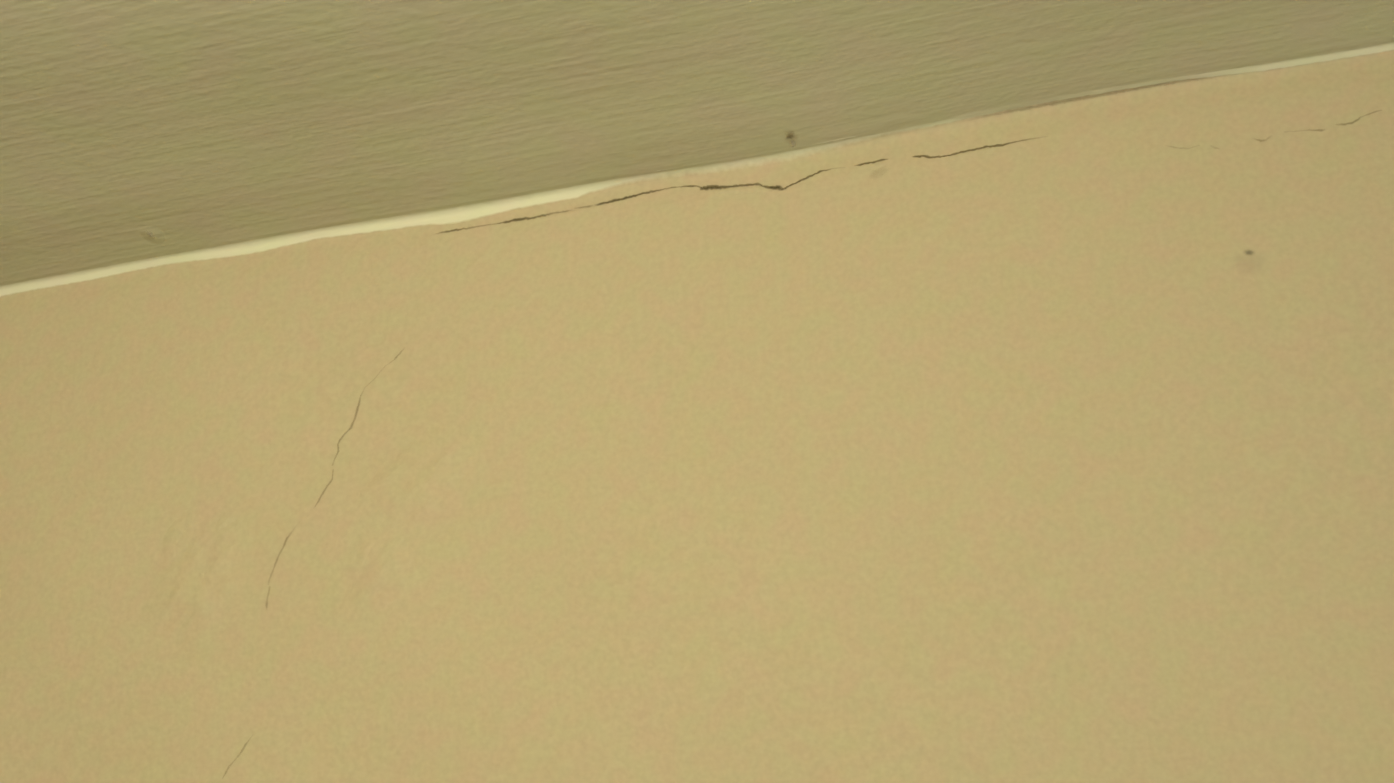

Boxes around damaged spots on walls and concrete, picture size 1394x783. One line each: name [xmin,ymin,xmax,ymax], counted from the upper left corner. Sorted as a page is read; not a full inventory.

crack [505,141,1017,226]